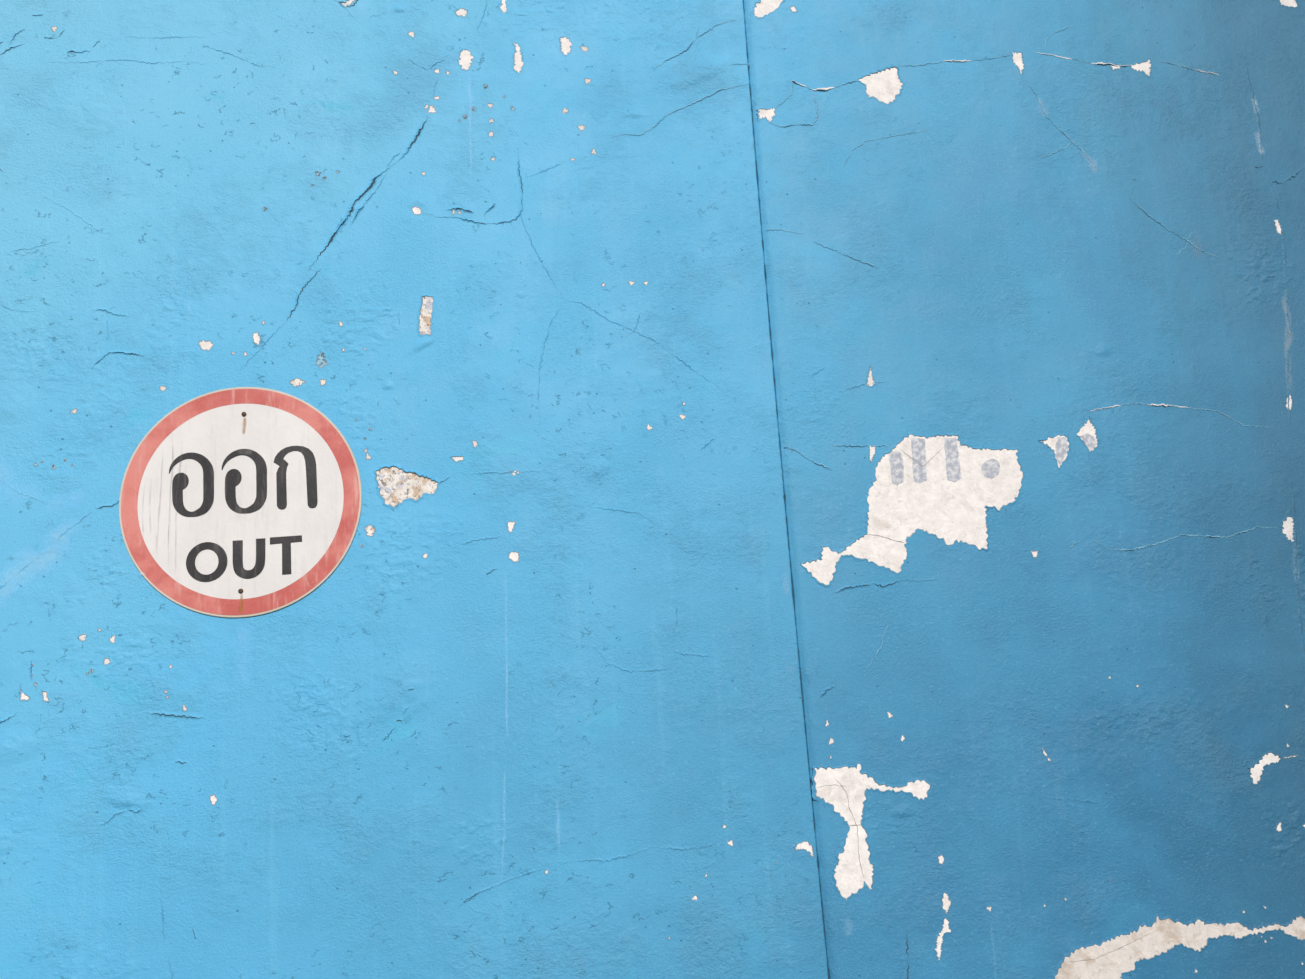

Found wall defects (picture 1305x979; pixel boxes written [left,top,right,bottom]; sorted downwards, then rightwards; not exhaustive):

crack [769,80,856,128]
peeling [856,65,905,106]
crack [898,27,1130,67]
crack [240,59,446,370]
crack [422,148,723,426]
crack [1090,56,1305,428]
flaking render [354,417,440,511]
peeling [800,432,1025,588]
crack [1069,481,1305,663]
peeling [811,719,932,904]
peeling [1247,742,1299,786]
peeling [1052,905,1305,979]